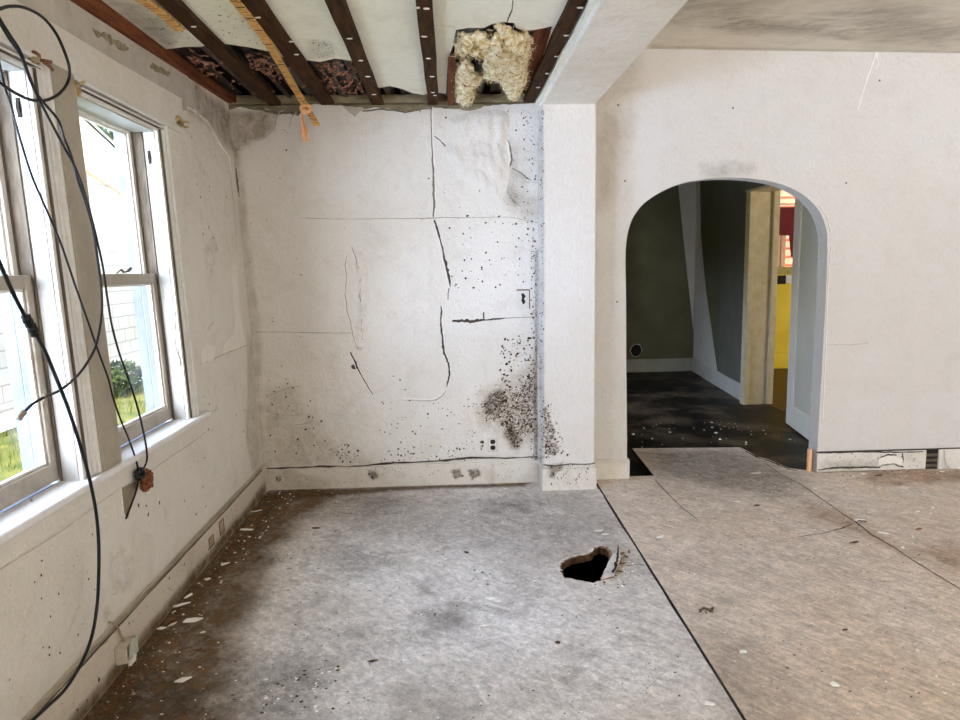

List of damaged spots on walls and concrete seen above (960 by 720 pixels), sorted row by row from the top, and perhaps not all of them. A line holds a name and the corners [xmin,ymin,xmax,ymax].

crack [348,352,373,395]
crack [371,107,537,401]
leakage [71,332,589,720]